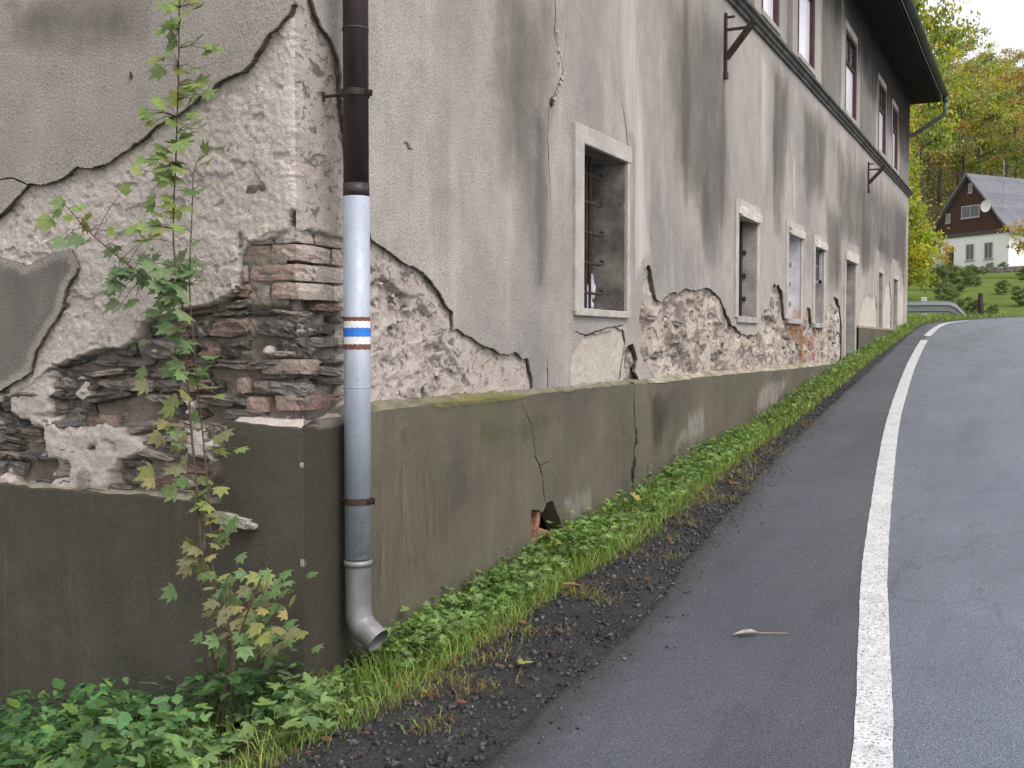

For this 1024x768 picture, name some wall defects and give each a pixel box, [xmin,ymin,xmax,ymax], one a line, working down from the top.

crack [547,9,566,198]
damp [623,0,647,270]
damp [761,54,824,207]
spalling [0,0,344,497]
spalling [370,236,533,402]
spalling [570,265,842,385]
crack [525,411,549,499]
spalling [526,503,564,554]
crack [628,382,638,492]